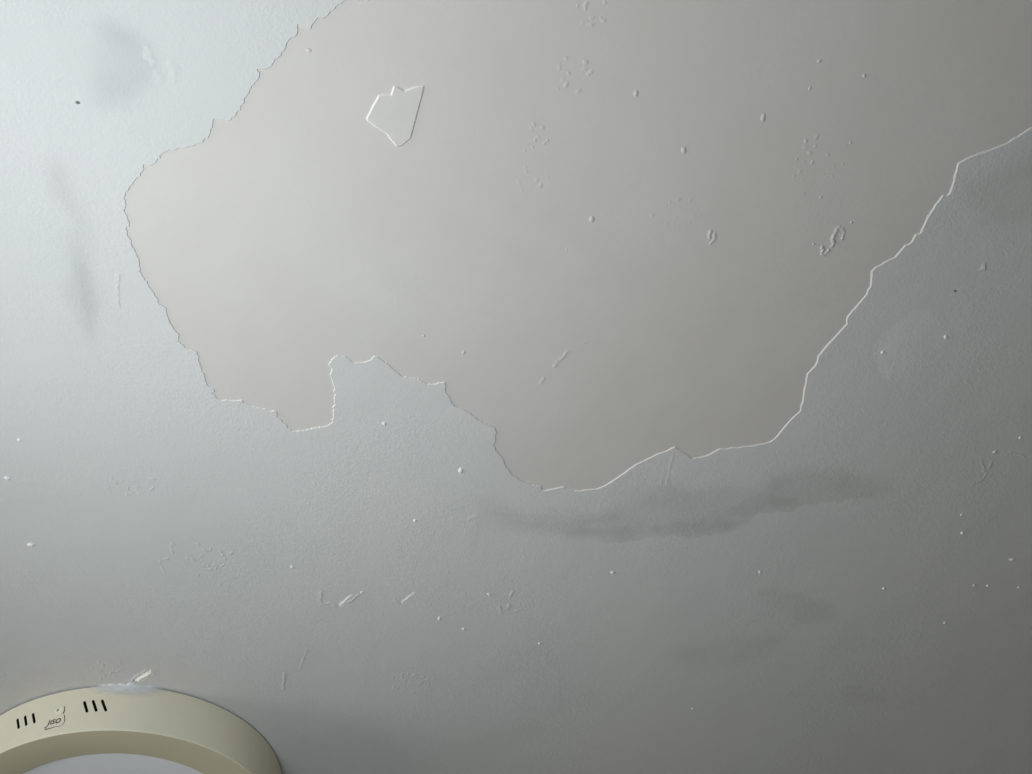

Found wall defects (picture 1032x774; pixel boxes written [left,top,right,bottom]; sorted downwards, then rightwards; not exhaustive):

spalling [812,221,853,257]